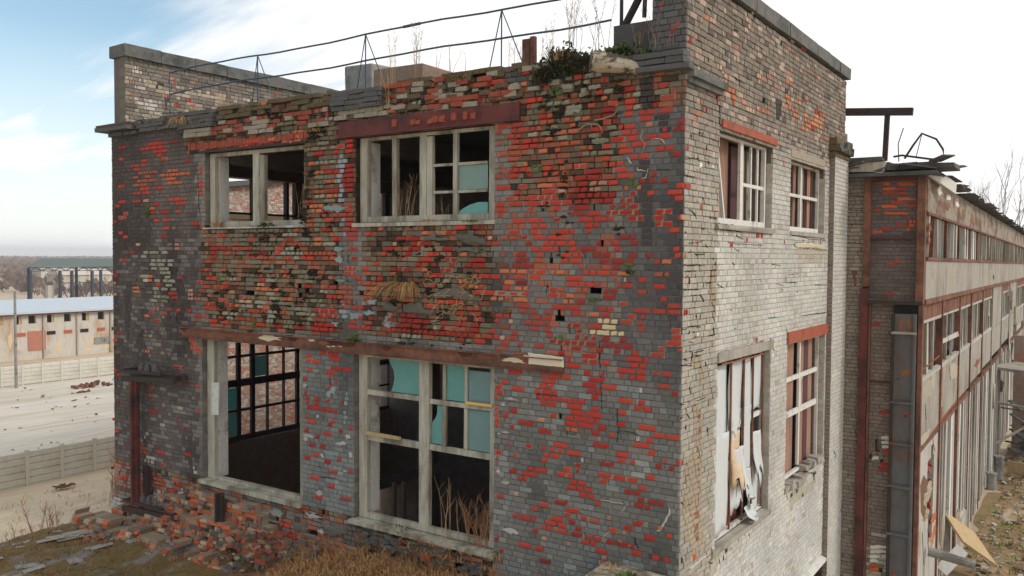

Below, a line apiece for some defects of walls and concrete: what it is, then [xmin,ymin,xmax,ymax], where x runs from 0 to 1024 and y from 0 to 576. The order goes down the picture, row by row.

peeling [133,70,715,565]